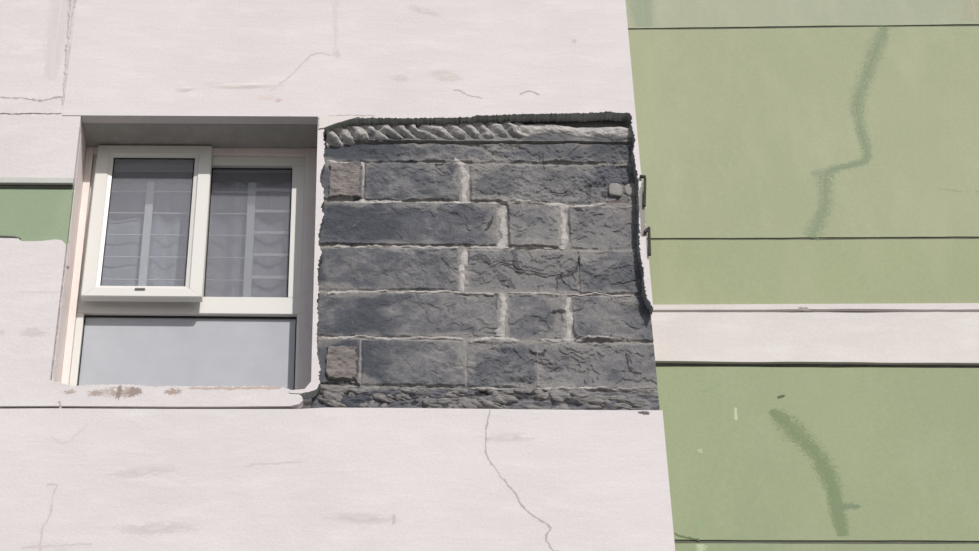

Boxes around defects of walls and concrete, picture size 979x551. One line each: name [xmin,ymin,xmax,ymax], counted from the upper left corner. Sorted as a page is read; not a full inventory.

leakage [803,26,891,241]
crack [21,483,92,551]
crack [484,410,558,551]
leakage [769,408,860,536]